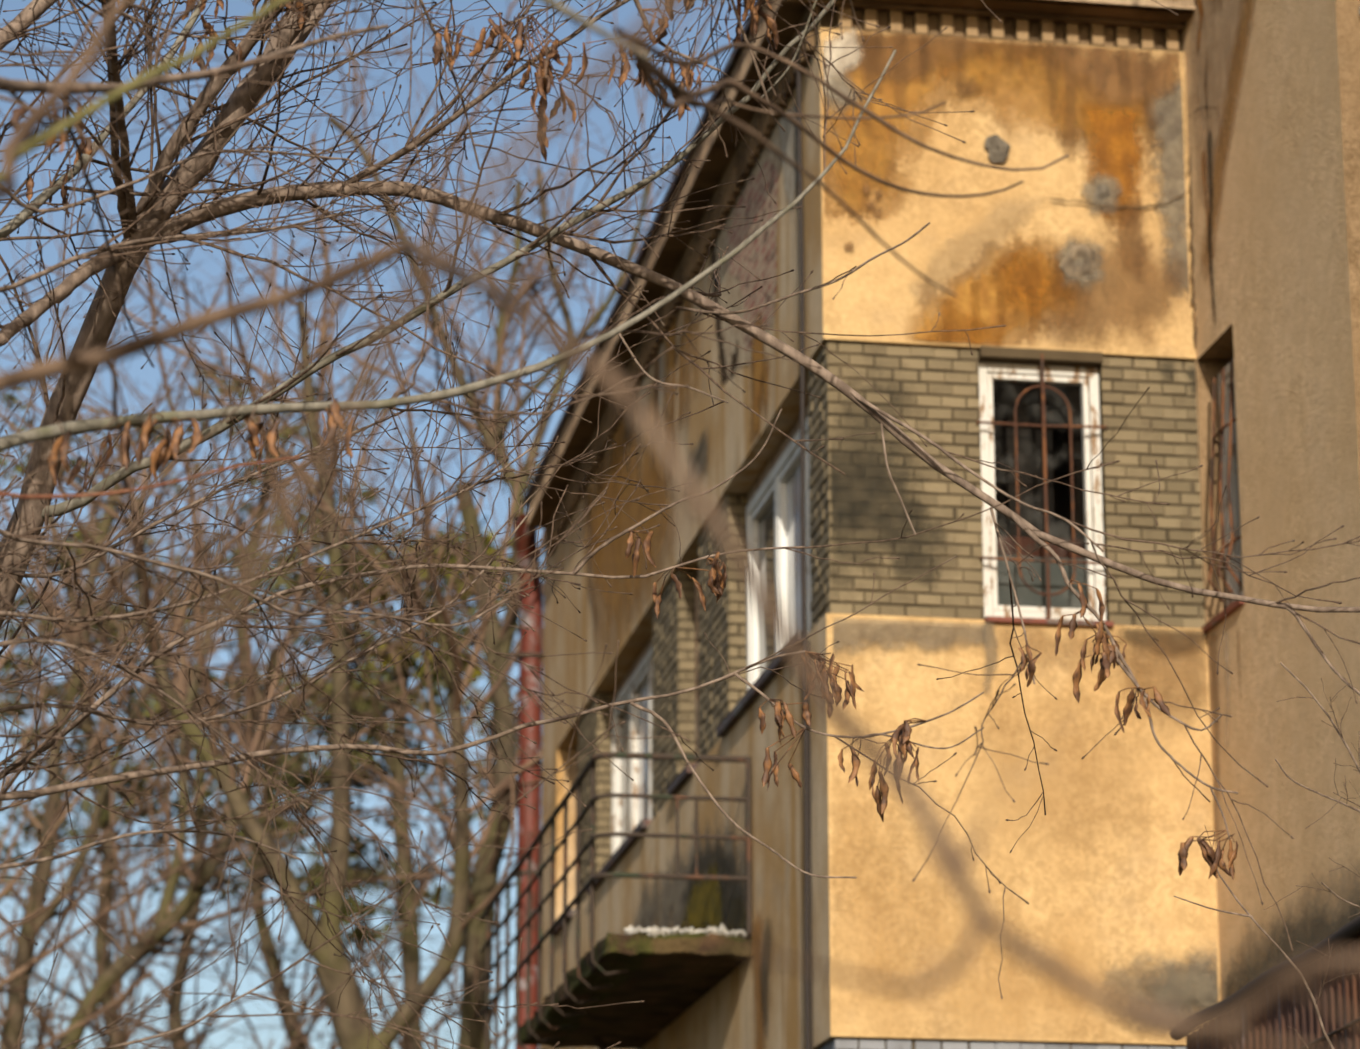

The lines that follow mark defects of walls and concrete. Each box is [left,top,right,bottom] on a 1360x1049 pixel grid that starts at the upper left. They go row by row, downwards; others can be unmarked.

spalling [985,134,1011,163]
leakage [822,0,1248,344]
spalling [1084,175,1121,212]
corrosion [1083,106,1146,265]
crack [1047,50,1219,347]
leakage [634,820,746,932]